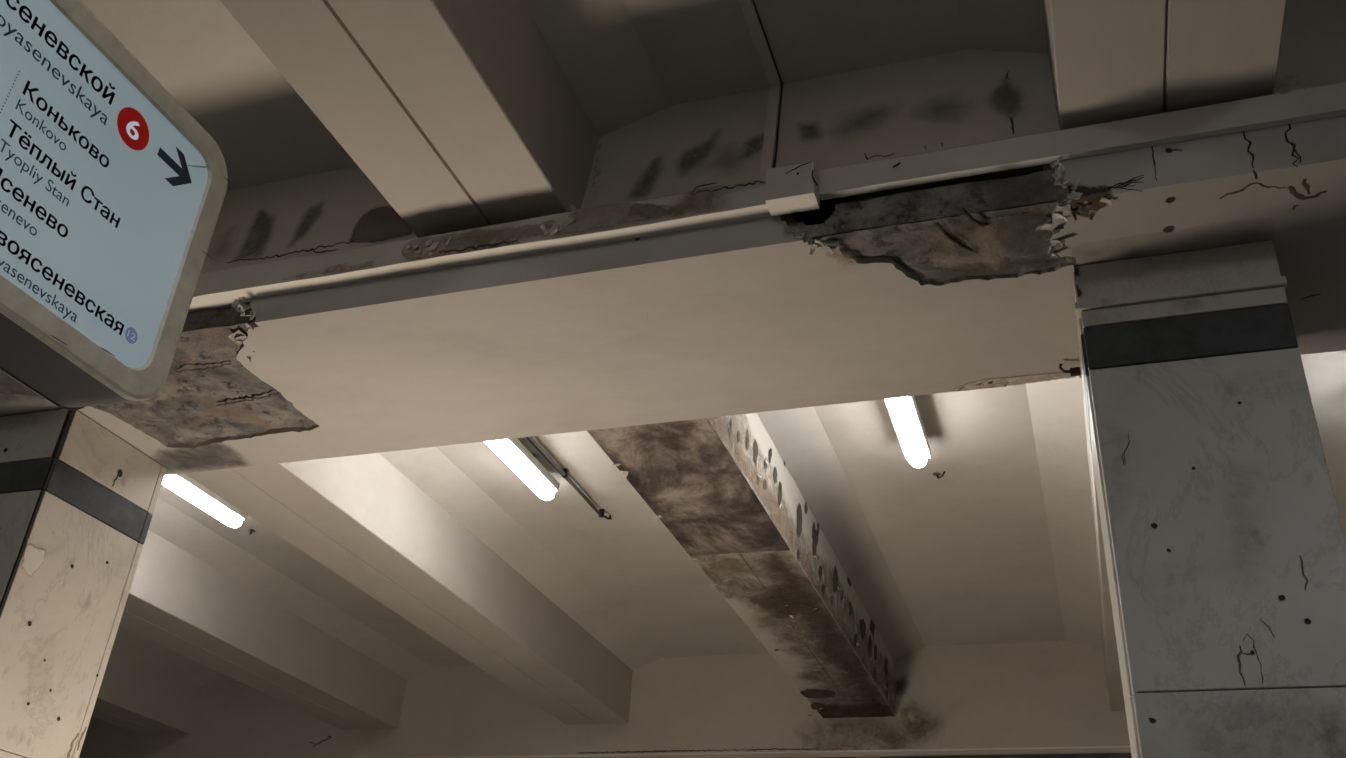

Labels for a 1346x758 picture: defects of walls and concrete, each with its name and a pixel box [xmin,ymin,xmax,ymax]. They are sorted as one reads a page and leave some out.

crack [1219,124,1327,210]
spalling [781,158,1144,298]
spalling [0,370,44,400]
spalling [94,300,317,469]
peeling [728,419,889,699]
crack [1236,620,1274,685]
peeling [796,689,835,710]